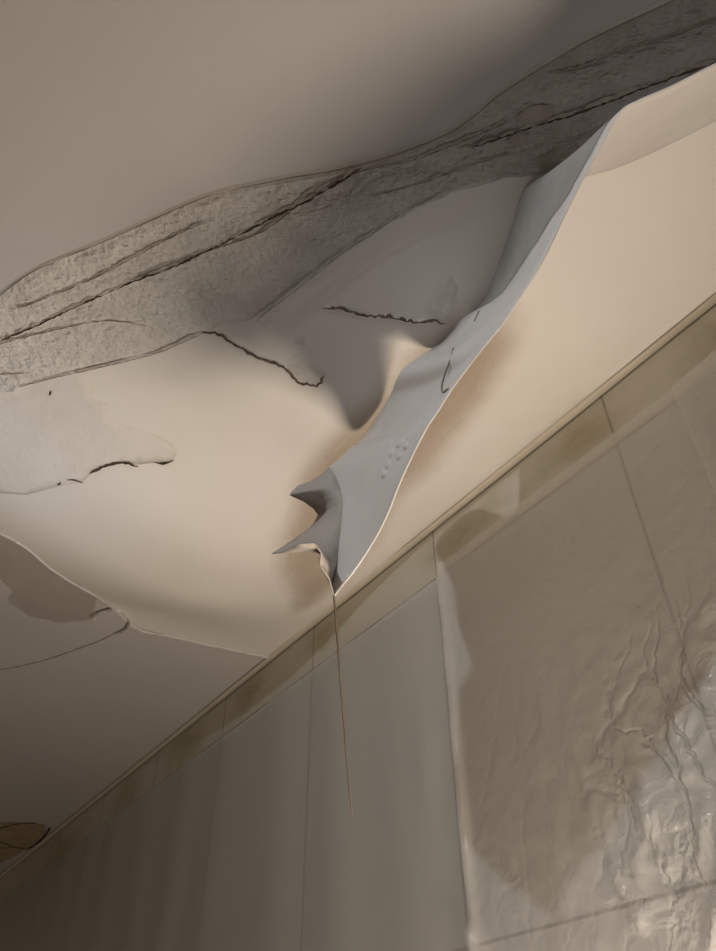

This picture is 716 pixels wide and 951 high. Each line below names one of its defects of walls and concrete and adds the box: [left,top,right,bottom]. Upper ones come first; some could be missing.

peeling [0,0,716,658]
peeling [272,63,716,815]
leakage [0,823,51,862]